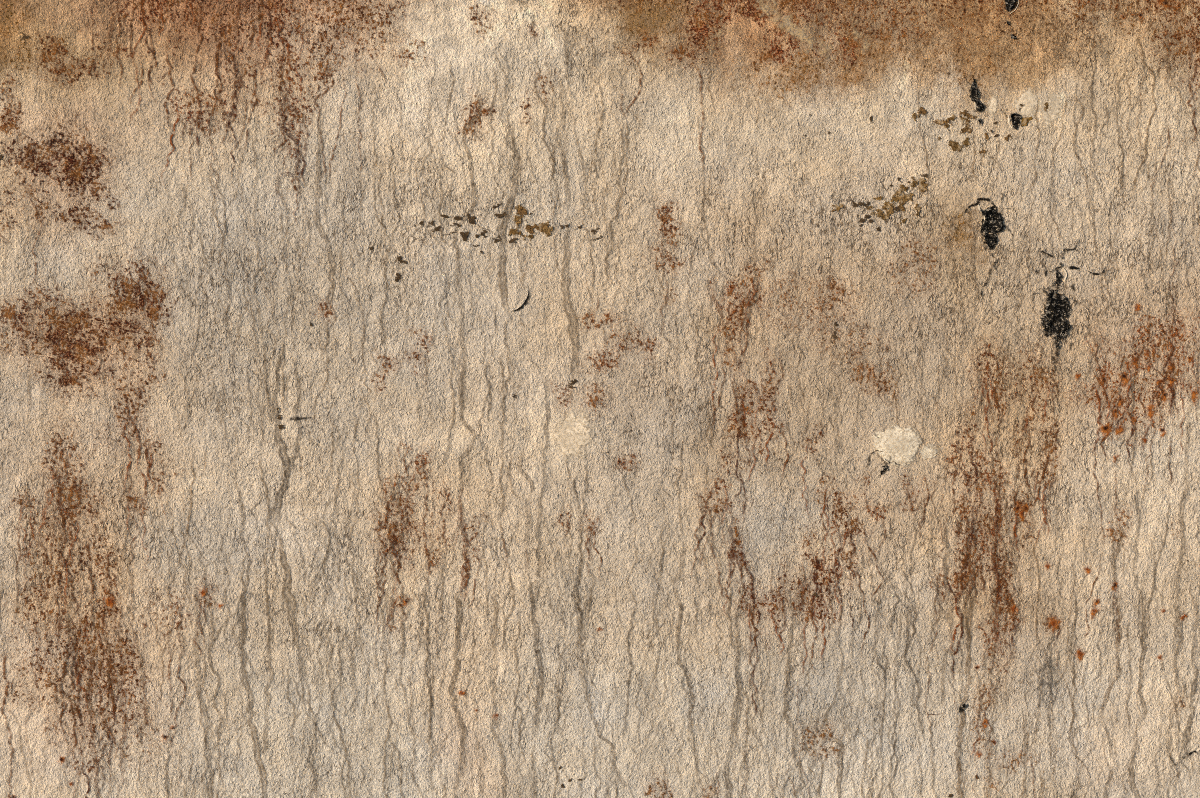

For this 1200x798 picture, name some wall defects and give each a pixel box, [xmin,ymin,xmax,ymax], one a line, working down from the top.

corrosion [0,75,120,243]
corrosion [38,0,430,215]
corrosion [601,0,1200,138]
corrosion [0,247,178,798]
water stain [54,541,221,798]
water stain [237,347,369,798]
water stain [380,459,558,798]
water stain [615,516,760,751]
corrosion [692,260,929,712]
water stain [877,431,1007,798]
corrosion [929,304,1200,797]
water stain [1025,458,1200,790]